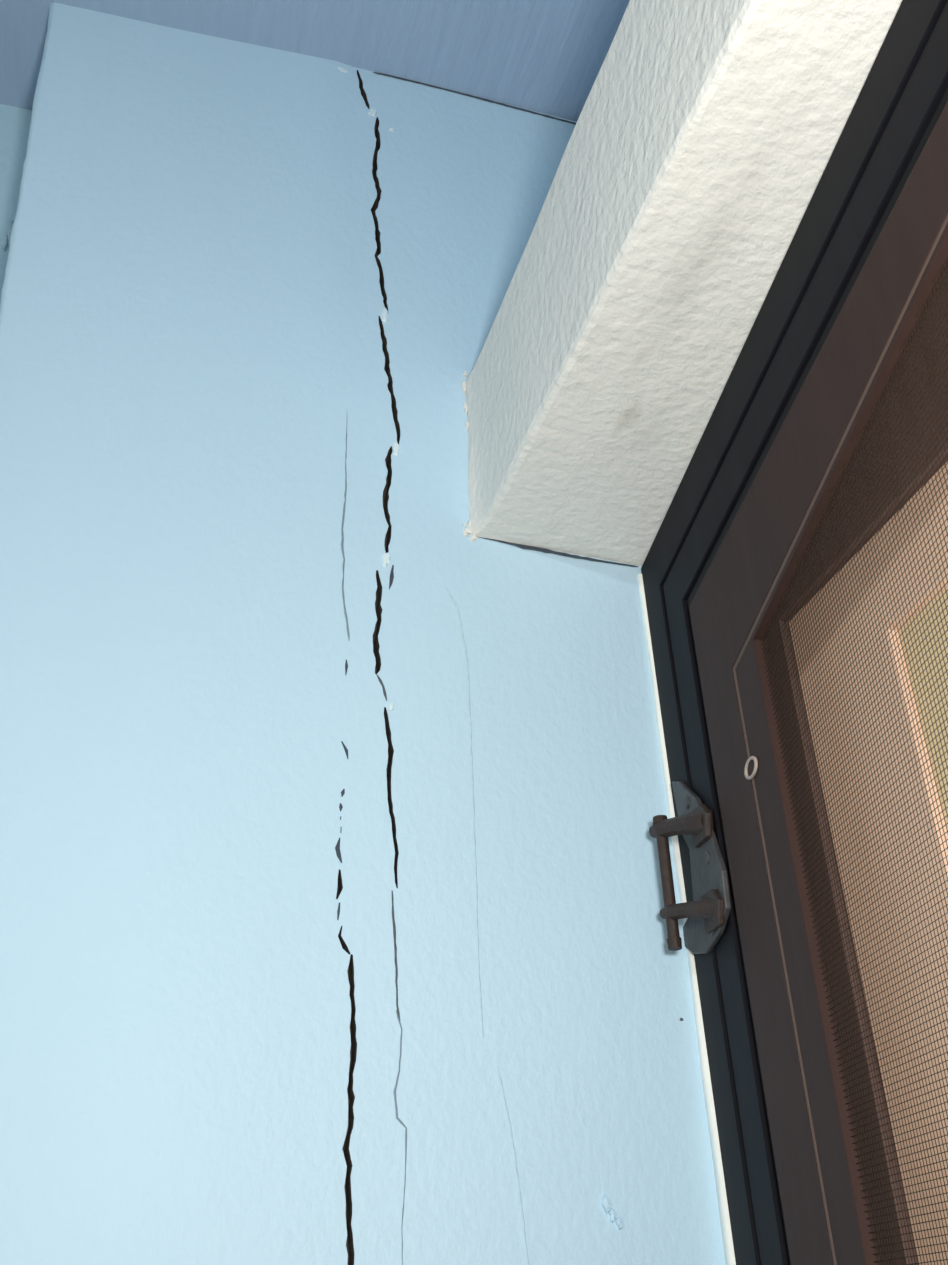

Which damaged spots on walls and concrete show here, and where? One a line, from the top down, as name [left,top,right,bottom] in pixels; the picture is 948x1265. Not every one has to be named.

crack [335,67,576,1265]